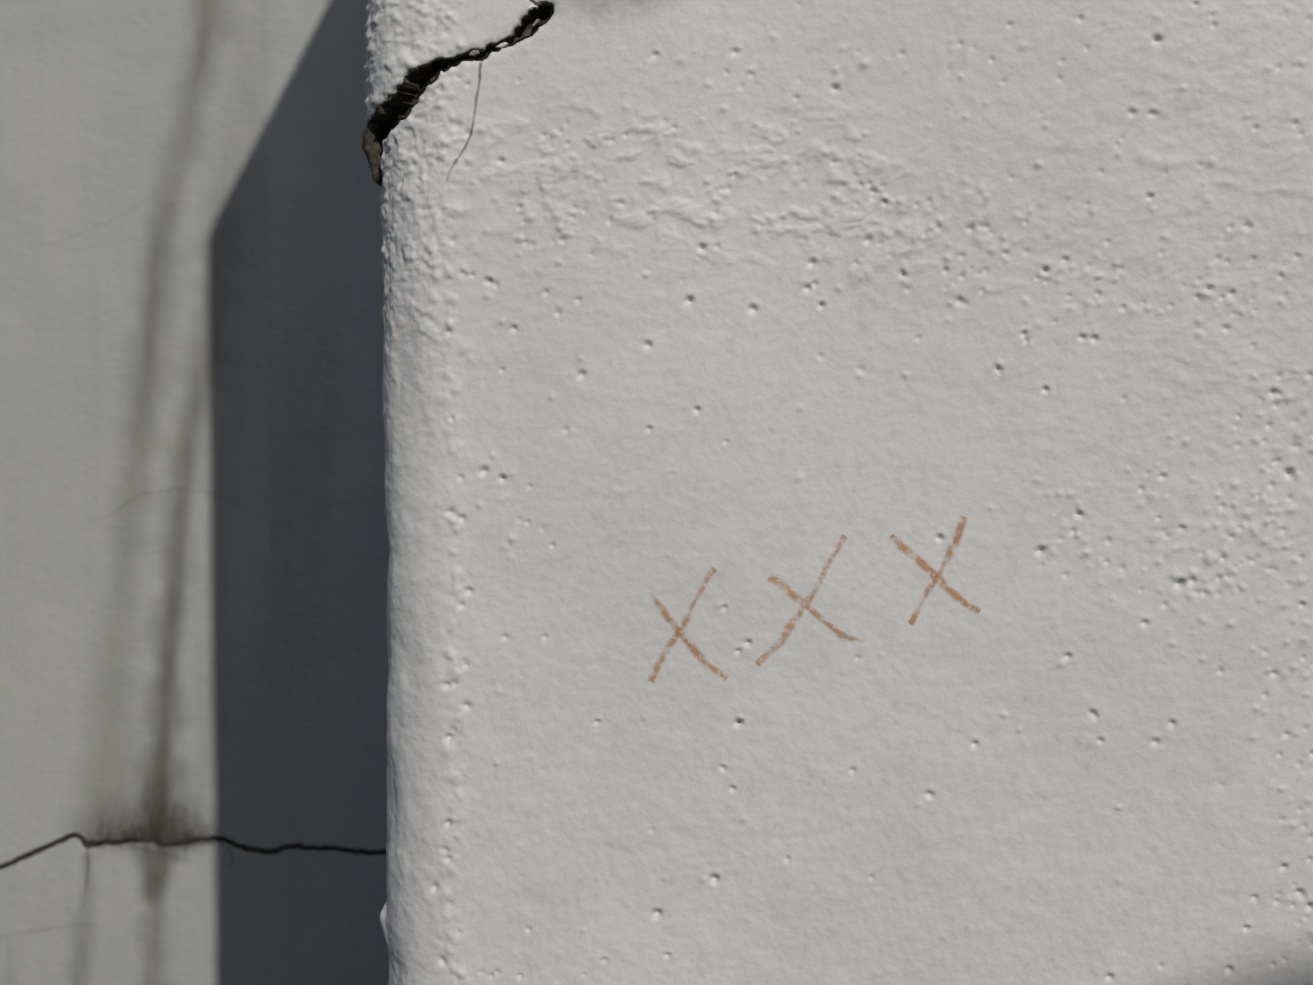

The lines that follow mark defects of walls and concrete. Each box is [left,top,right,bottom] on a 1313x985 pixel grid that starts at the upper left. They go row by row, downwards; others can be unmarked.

crack [361,5,552,187]
crack [0,834,386,869]